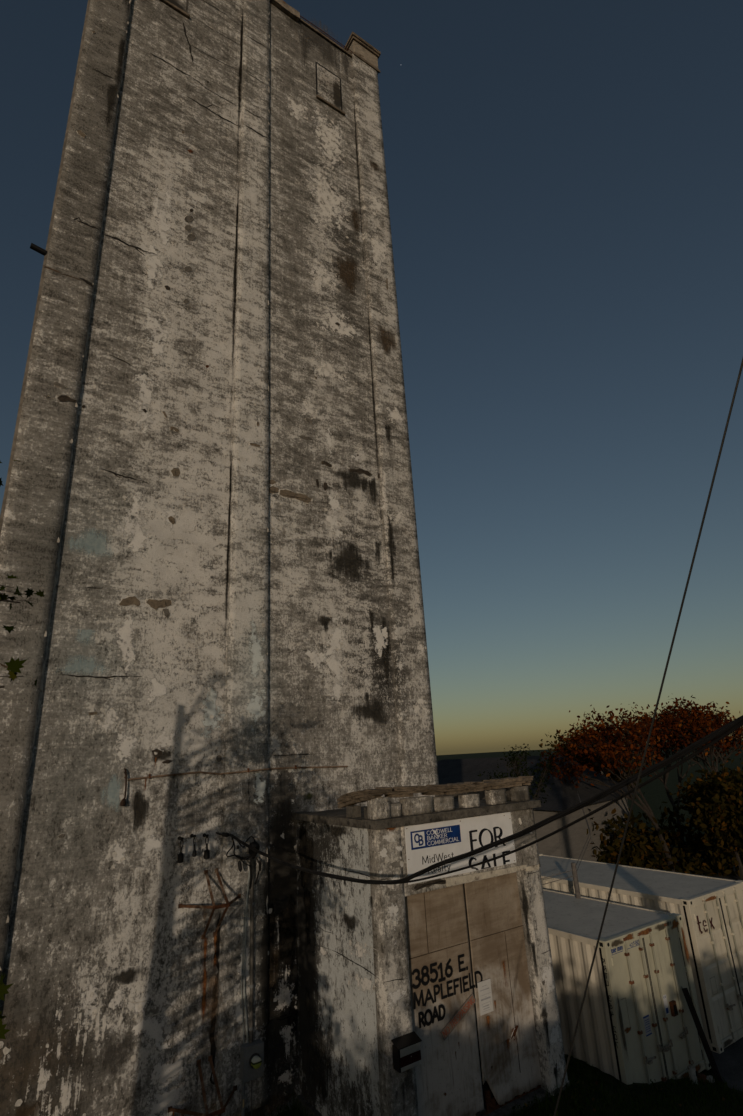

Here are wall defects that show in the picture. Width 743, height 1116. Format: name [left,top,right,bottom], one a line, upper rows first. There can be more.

damp [106,39,126,127]
damp [352,107,378,232]
damp [368,316,395,464]
crack [0,0,270,971]
damp [330,471,396,581]
peeling [11,973,197,1116]
crack [209,913,220,1085]
peeling [268,908,297,1085]
damp [268,825,314,1034]
damp [307,1040,332,1099]
damp [343,915,356,929]